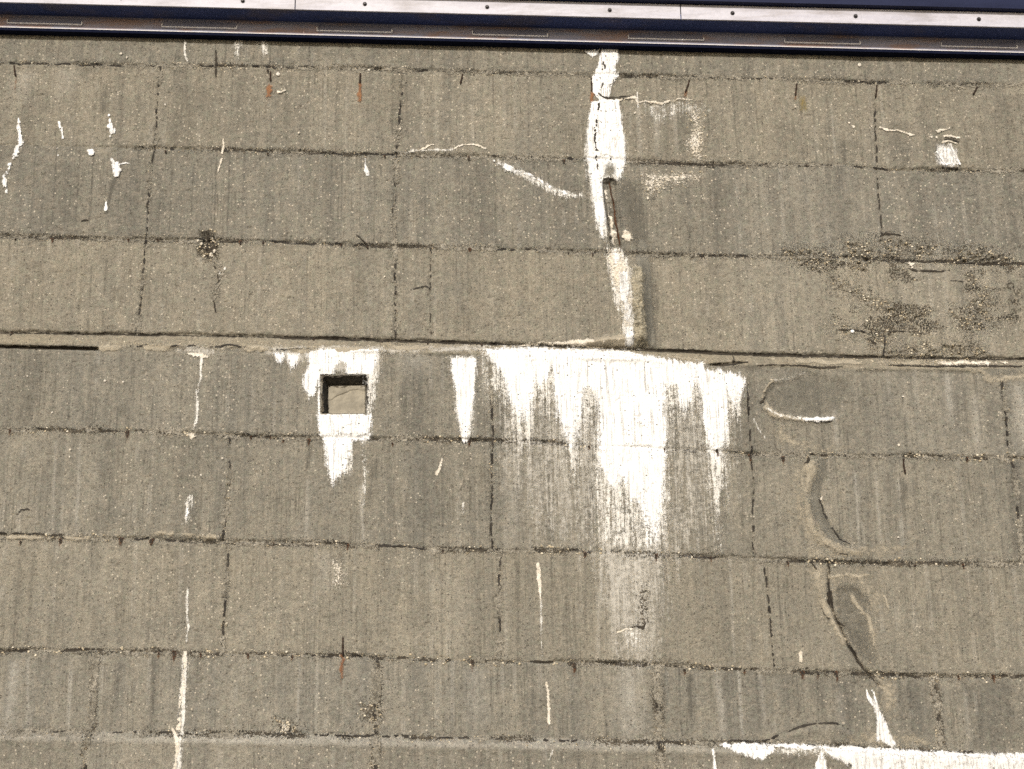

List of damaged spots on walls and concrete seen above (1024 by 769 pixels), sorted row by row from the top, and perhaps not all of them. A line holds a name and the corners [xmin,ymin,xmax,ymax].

spalling [0,125,375,261]
efflorescence [399,143,486,154]
spalling [388,107,573,163]
spalling [525,177,704,260]
spalling [751,236,1024,420]
leakage [273,347,415,510]
efflorescence [450,244,746,669]
crack [811,562,879,685]
leakage [712,676,1024,769]